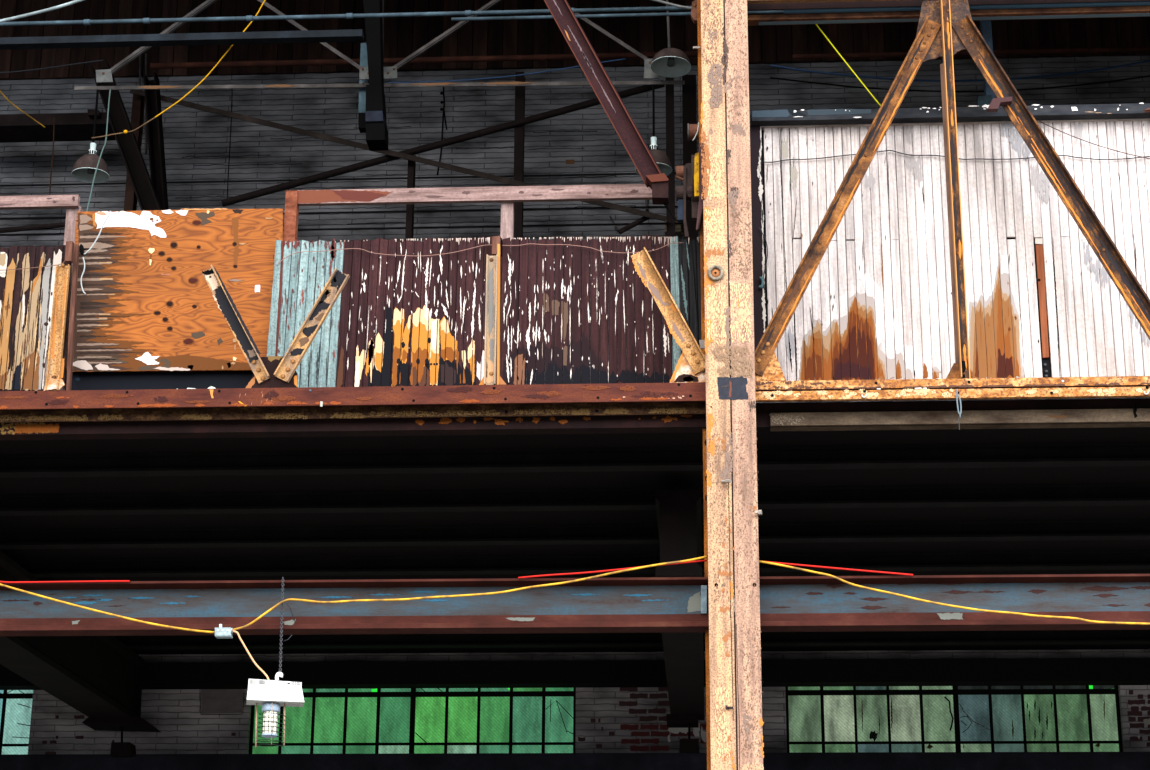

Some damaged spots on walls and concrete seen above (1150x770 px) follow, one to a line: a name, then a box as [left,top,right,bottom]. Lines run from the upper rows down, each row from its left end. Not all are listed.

peeling [73,360,120,371]
peeling [95,208,227,276]
peeling [136,352,190,371]
peeling [205,274,260,310]
peeling [331,245,484,387]
peeling [503,255,600,385]
rust [700,101,711,224]
rust [704,200,752,299]
rust [755,264,1120,390]
rust [979,60,1150,336]
rust [704,412,759,613]
rust [723,623,764,770]